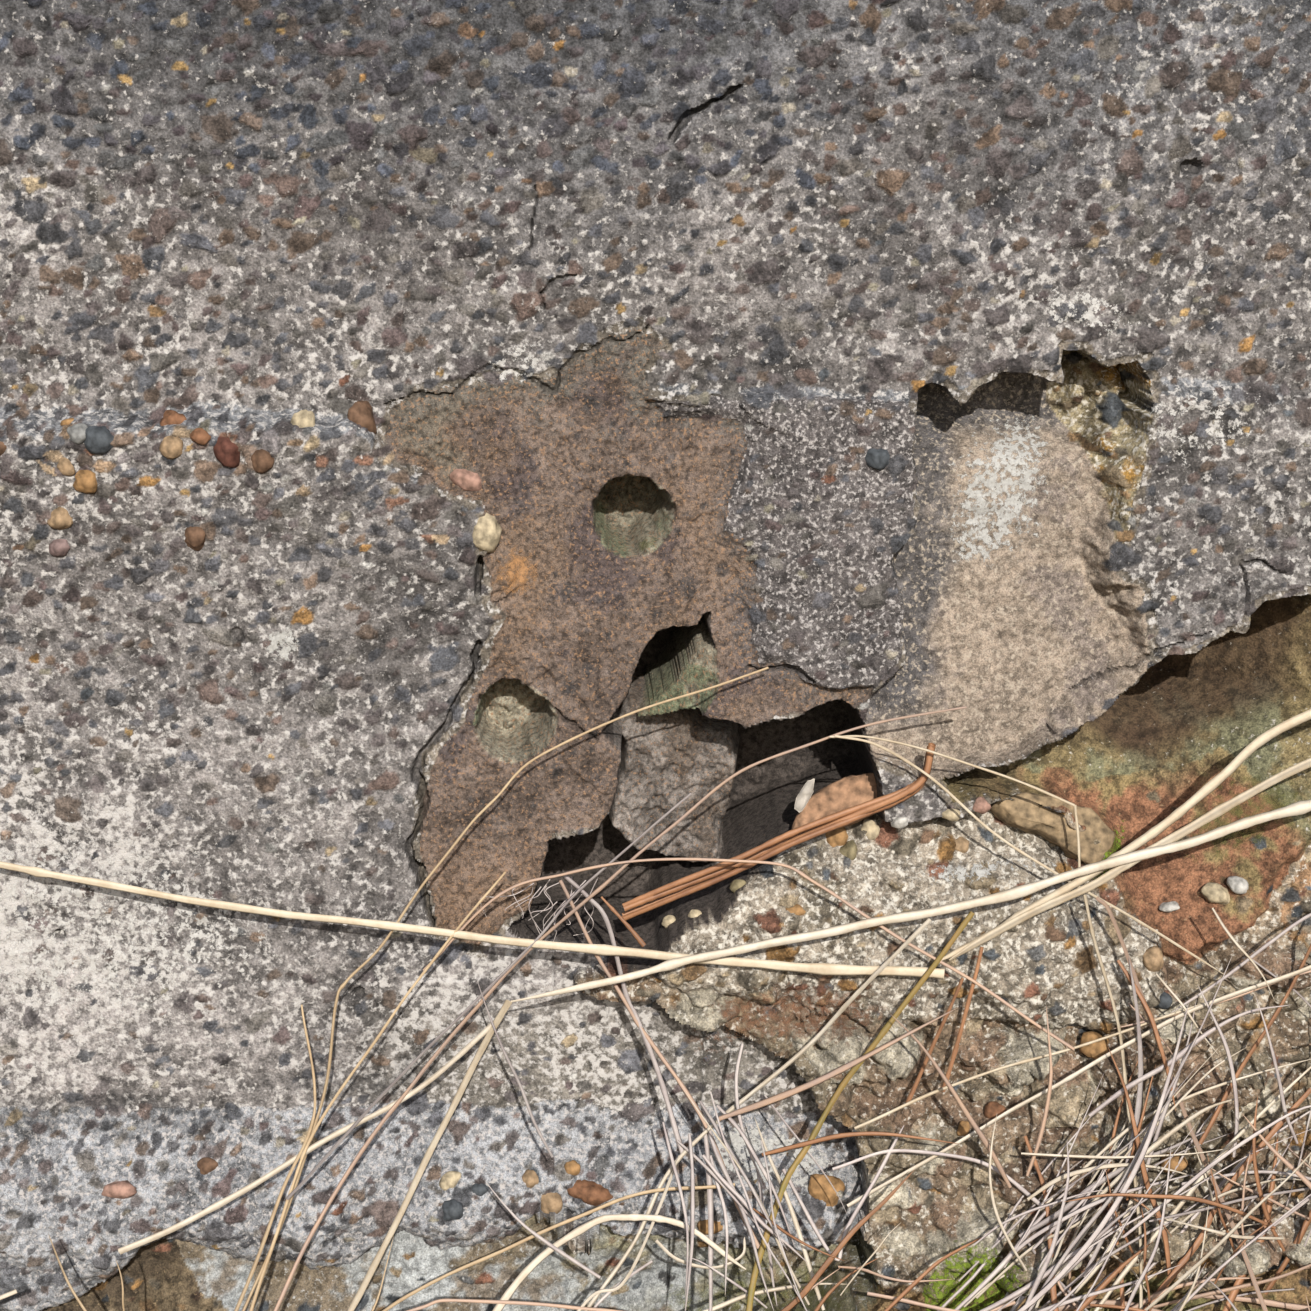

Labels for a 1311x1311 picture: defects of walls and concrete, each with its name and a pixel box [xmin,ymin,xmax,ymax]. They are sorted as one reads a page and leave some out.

crack [668,84,743,142]
crack [406,639,483,927]
crack [493,584,527,602]
spalling [374,315,1311,980]